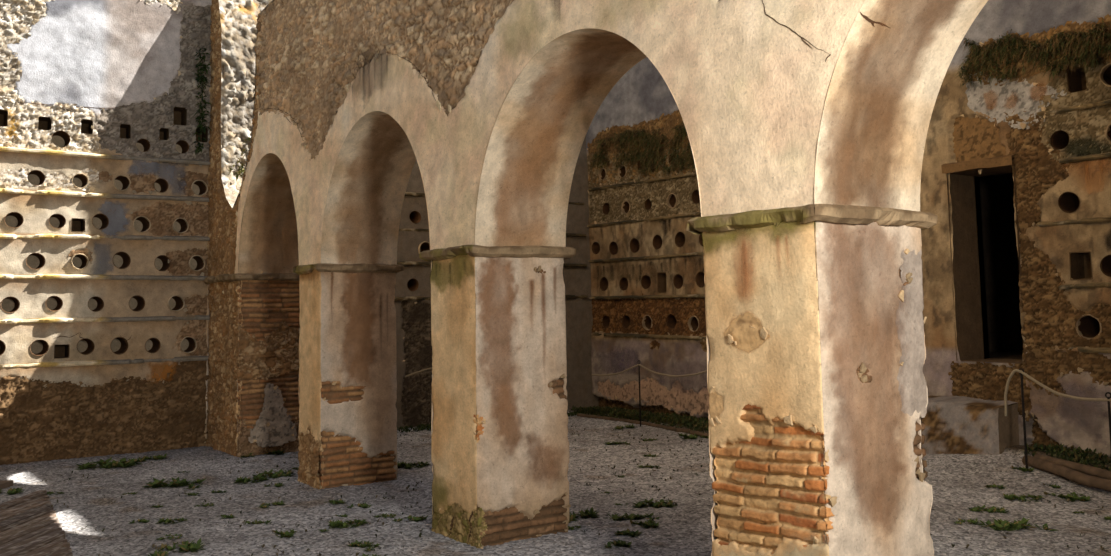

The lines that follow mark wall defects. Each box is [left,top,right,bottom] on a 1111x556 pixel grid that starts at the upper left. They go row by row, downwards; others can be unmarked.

crack [762,1,831,62]
spalling [0,0,514,490]
leakage [480,258,515,353]
leakage [835,225,893,350]
spalling [948,14,1111,446]
leakage [494,375,520,445]
flaking render [431,492,571,549]
flaking render [710,404,837,554]